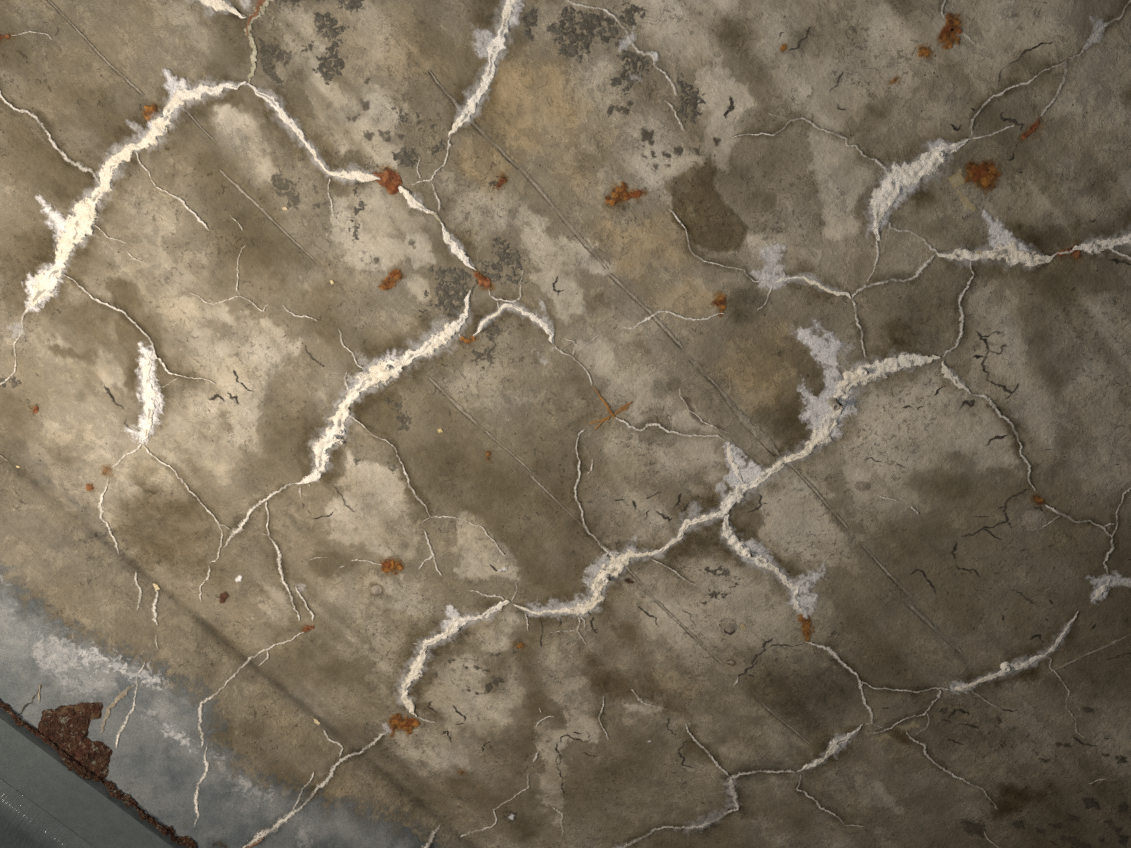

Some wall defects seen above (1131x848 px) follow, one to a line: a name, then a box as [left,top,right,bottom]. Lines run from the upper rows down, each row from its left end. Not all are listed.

crack [244,0,274,83]
corrosion [918,13,962,57]
corrosion [372,165,402,194]
water stain [0,69,592,600]
water stain [398,0,1131,723]
crack [903,330,1131,629]
water stain [134,573,160,624]
corrosion [0,700,196,848]
water stain [75,646,165,747]
crack [194,502,314,823]
crack [243,730,386,848]
corrosion [388,713,420,737]